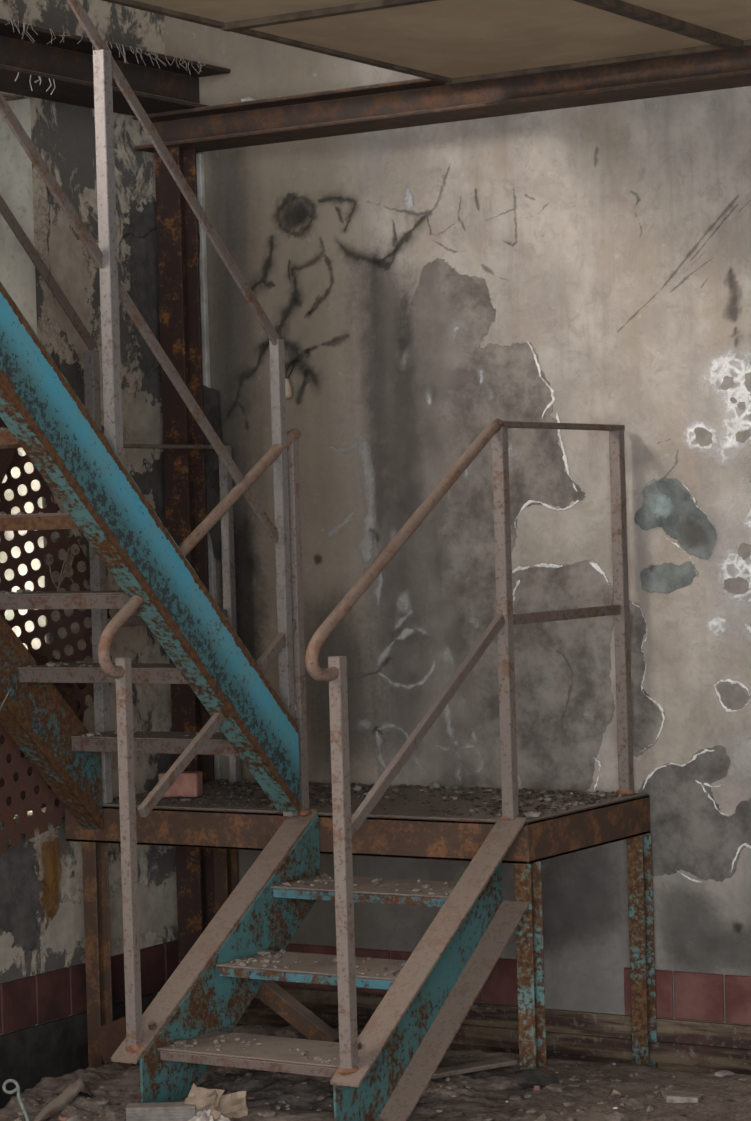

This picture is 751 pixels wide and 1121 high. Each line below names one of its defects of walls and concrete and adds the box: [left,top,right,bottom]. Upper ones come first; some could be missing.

leakage [685,269,751,461]
rust [0,448,16,486]
peeling [419,258,585,789]
spalling [634,478,717,573]
leakage [718,542,751,602]
peeling [512,560,615,792]
peeling [629,600,665,757]
spalling [714,679,750,712]
rust [0,735,60,811]
peeling [639,745,751,883]
peeling [109,886,123,953]
peeling [138,872,178,940]